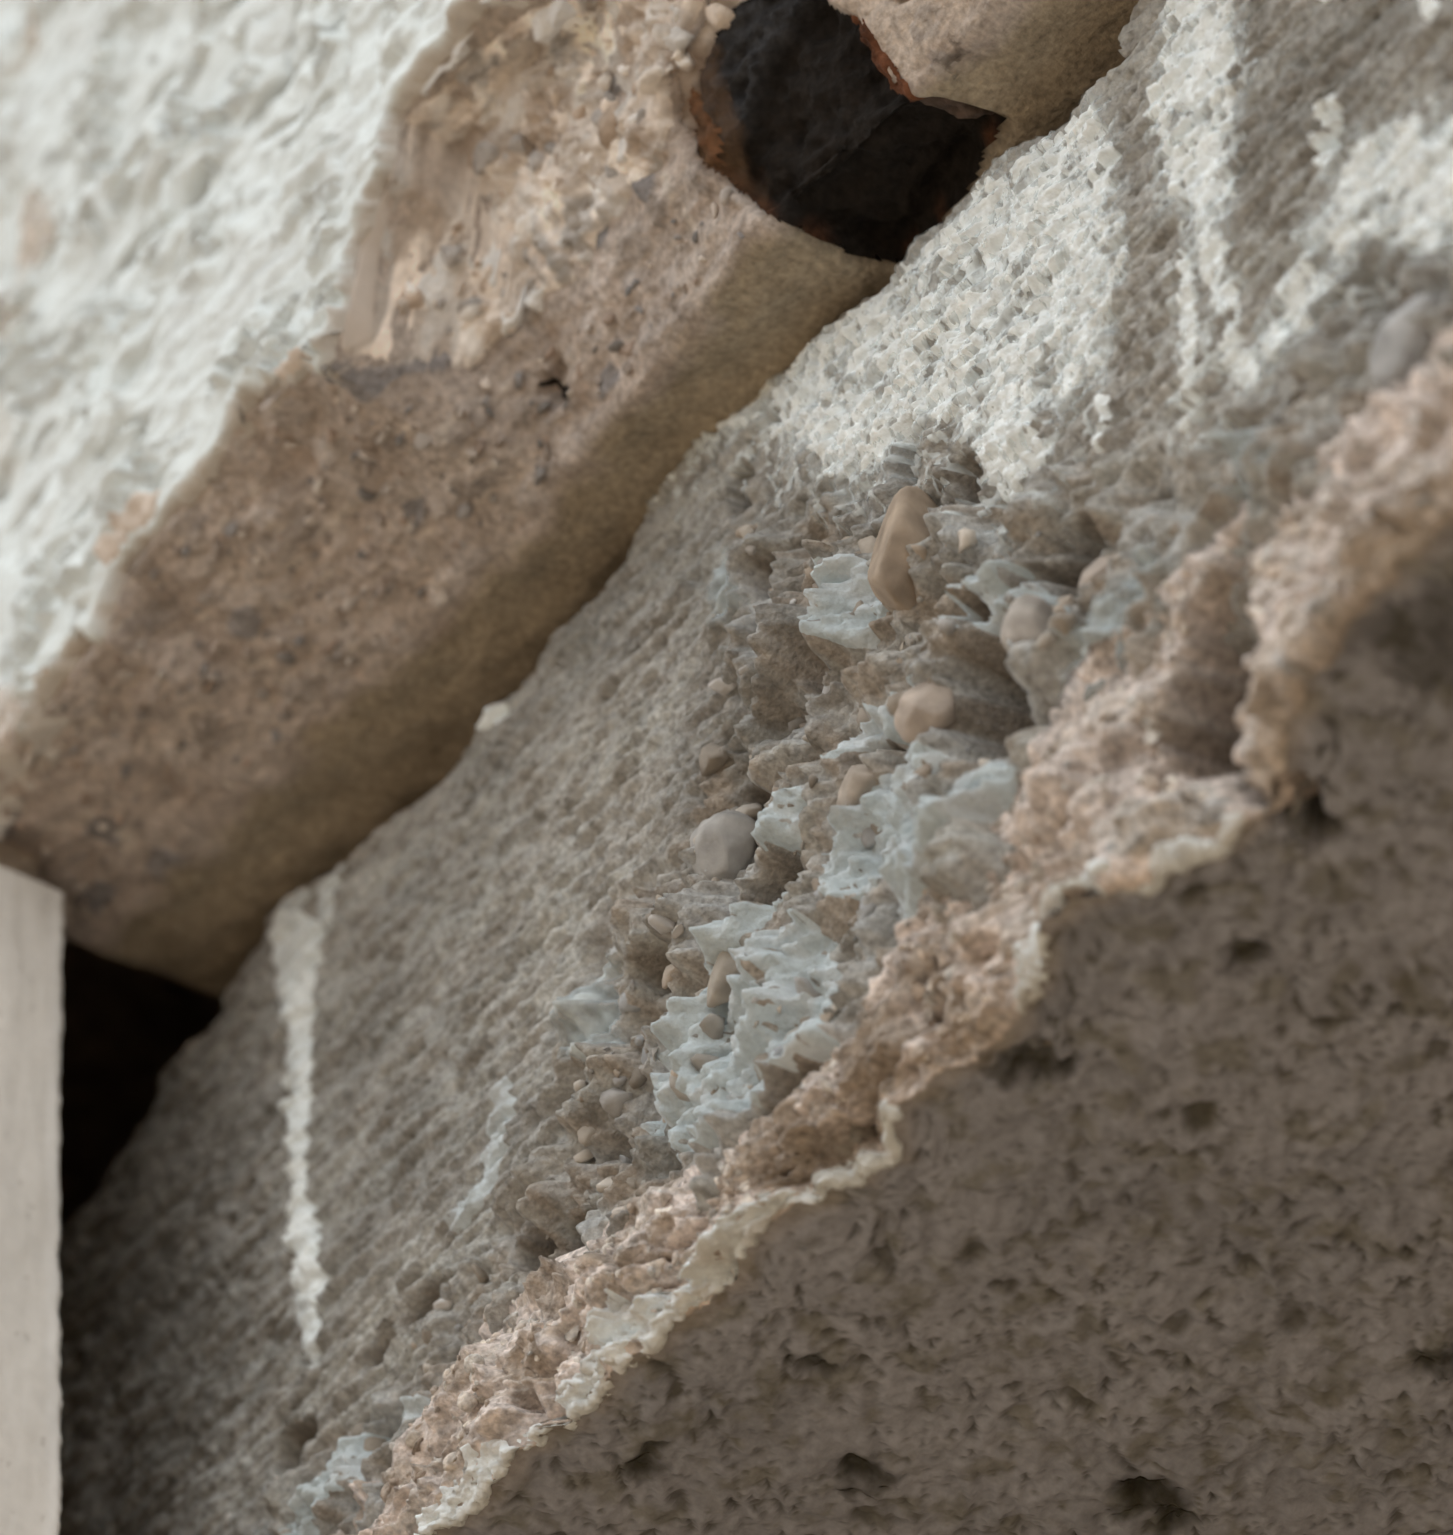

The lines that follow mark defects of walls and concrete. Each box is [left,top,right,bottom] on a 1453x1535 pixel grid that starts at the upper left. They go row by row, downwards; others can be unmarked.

corrosion [851,14,995,119]
crack [945,41,963,65]
corrosion [688,83,727,167]
spalling [339,0,746,369]
leakage [1142,0,1453,450]
peeling [93,488,161,567]
leakage [279,863,346,928]
spalling [332,328,1453,1535]
leakage [292,1292,322,1369]